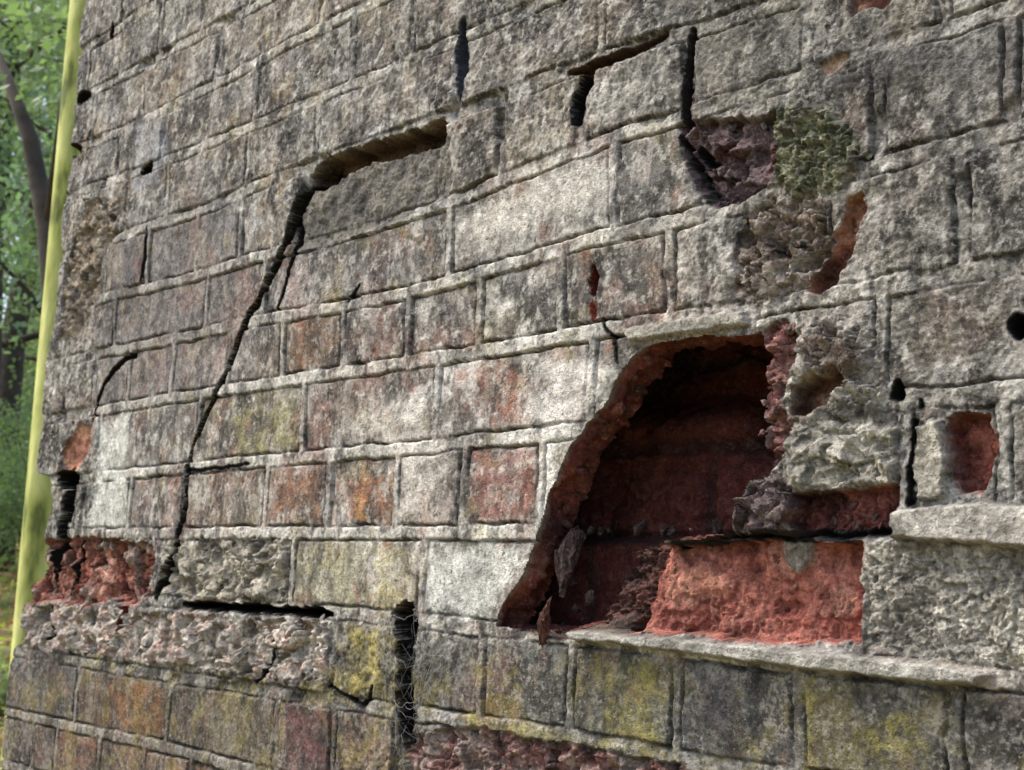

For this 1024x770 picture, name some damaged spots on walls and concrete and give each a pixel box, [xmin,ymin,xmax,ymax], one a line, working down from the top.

crack [92,351,140,425]
spalling [19,421,331,686]
crack [154,171,345,600]
crack [347,282,361,304]
spalling [496,316,1024,675]
spalling [678,113,868,311]
crack [905,417,921,508]
spalling [402,722,689,770]